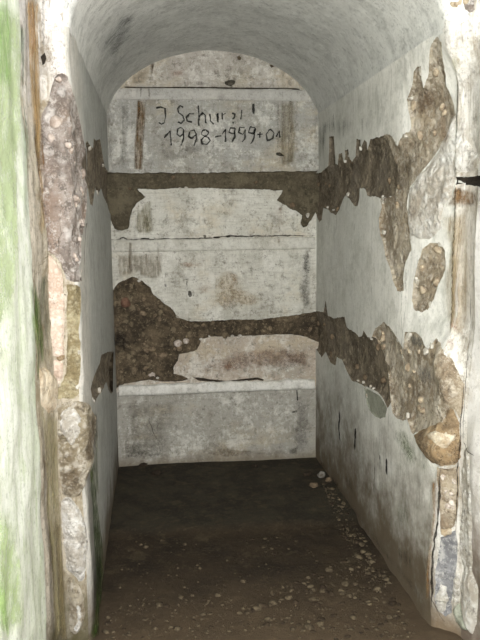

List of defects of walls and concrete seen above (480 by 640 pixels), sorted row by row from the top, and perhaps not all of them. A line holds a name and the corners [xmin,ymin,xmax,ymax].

corrosion [135,101,144,169]
crack [111,233,312,241]
flaking render [37,37,480,434]
crack [430,330,474,622]
peeling [434,447,473,616]